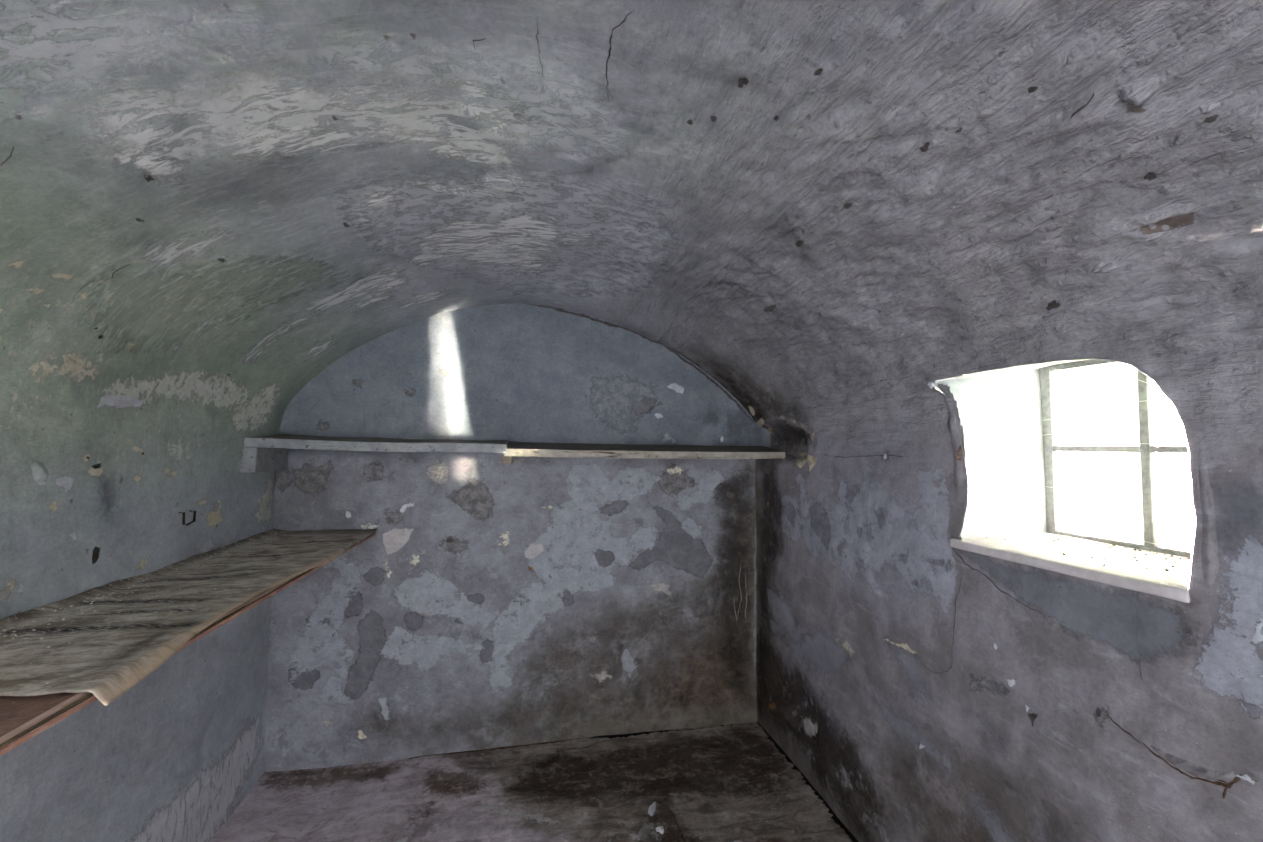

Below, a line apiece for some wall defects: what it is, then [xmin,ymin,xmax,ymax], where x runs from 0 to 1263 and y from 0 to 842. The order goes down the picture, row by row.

crack [605,11,633,102]
peeling [287,460,725,700]
water stain [466,474,883,842]
peeling [1191,534,1263,720]
peeling [378,698,392,724]
crack [1102,707,1258,798]
spalling [1150,745,1261,785]